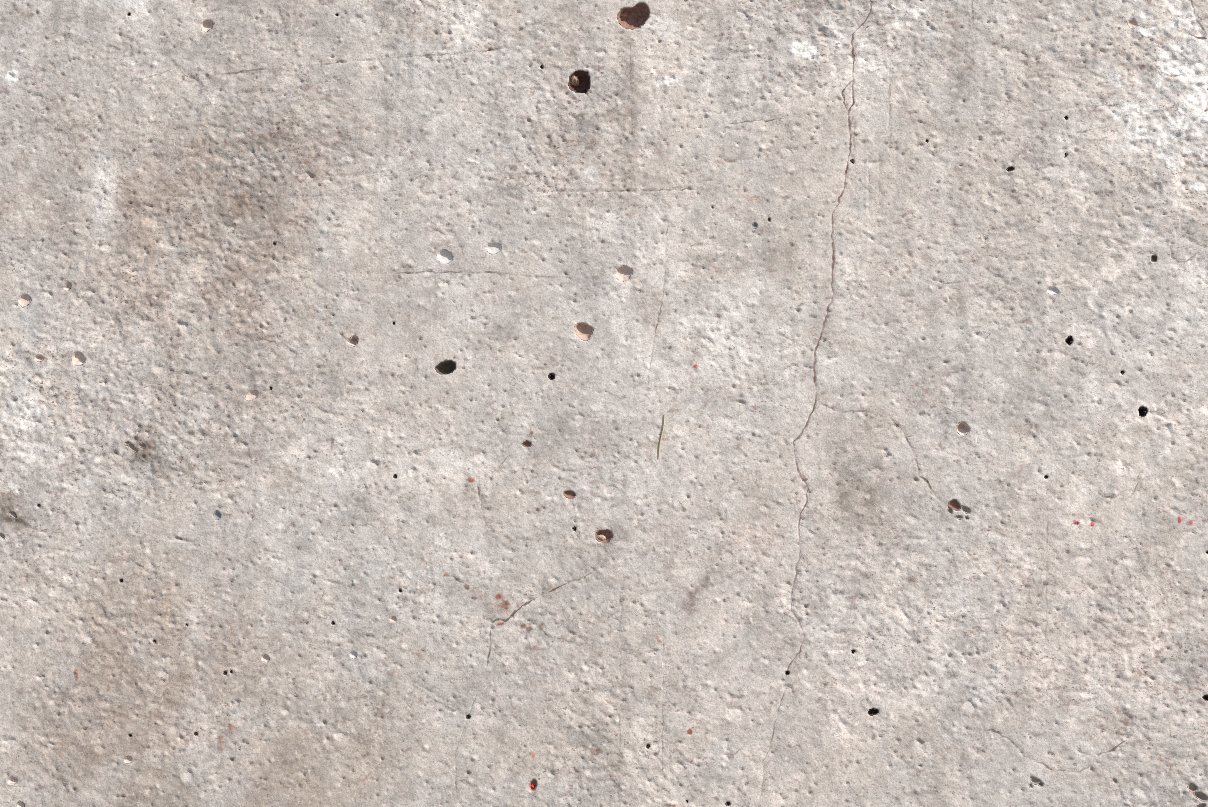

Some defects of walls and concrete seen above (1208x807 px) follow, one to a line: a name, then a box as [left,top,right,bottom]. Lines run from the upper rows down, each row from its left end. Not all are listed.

crack [792,4,872,658]